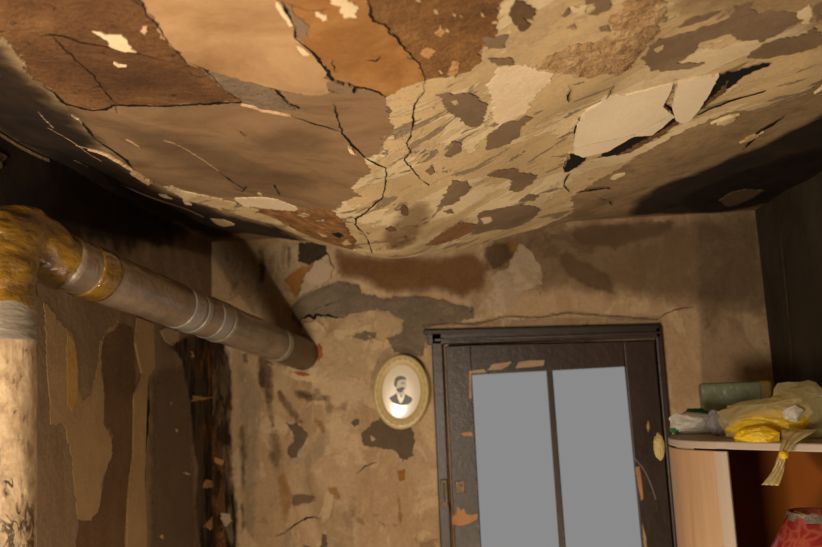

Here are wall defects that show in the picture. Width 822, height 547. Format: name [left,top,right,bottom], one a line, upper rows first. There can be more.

peeling [331,0,359,18]
flaking render [0,0,296,112]
crack [0,0,387,253]
crack [367,0,430,186]
spalling [435,0,822,193]
crack [698,90,766,115]
crack [744,117,784,149]
peeling [436,180,472,214]
peeling [470,168,541,235]
peeling [474,242,543,312]
peeling [43,303,136,547]
peeling [351,418,415,481]